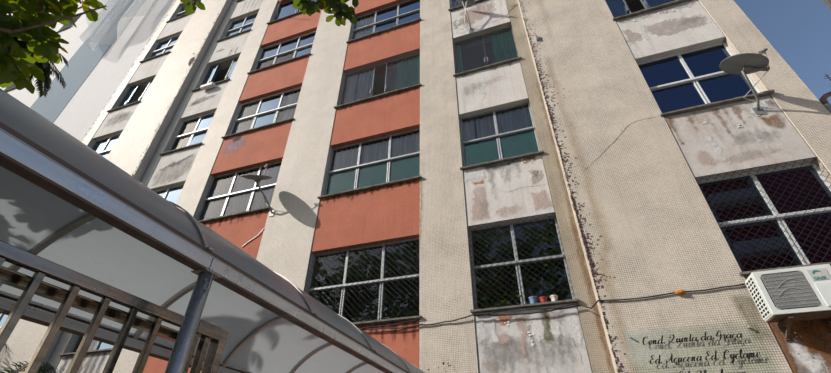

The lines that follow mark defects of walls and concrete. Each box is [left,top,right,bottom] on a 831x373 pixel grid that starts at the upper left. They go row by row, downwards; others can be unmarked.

peeling [519,0,628,373]
peeling [478,312,584,356]
damp [541,310,561,341]
rust [769,318,831,373]